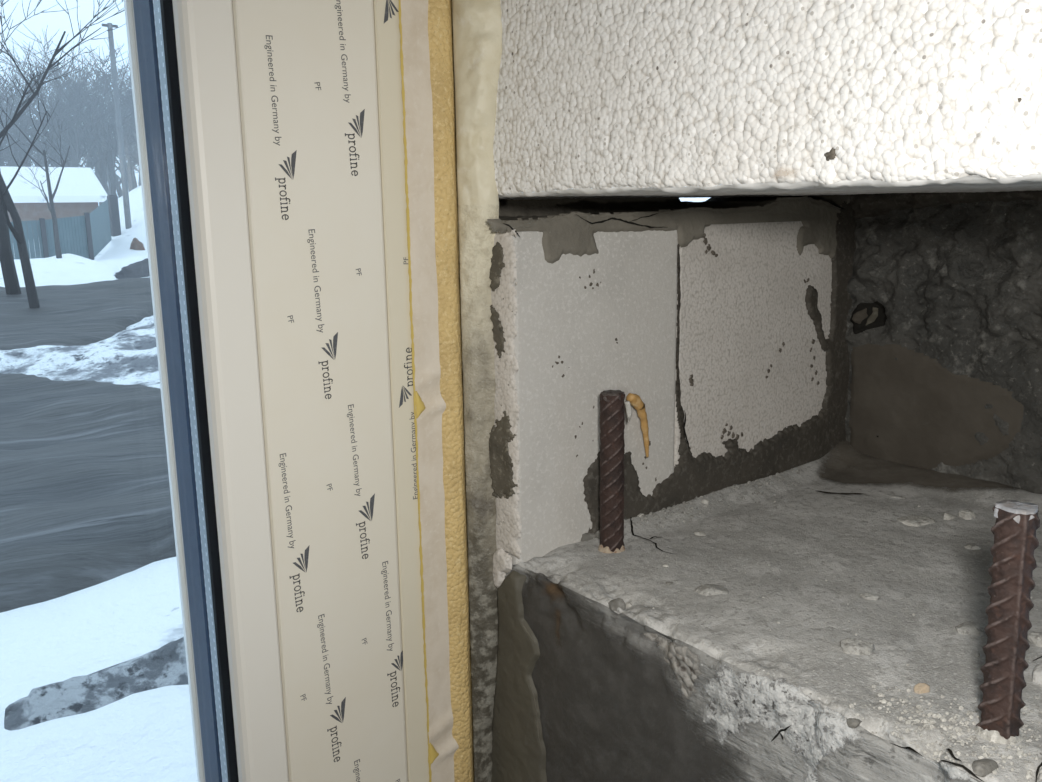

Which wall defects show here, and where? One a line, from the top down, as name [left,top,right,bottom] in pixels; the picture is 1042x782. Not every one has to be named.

spalling [608,598,632,611]
spalling [964,500,1042,745]
spalling [643,632,864,782]
spalling [905,750,999,782]